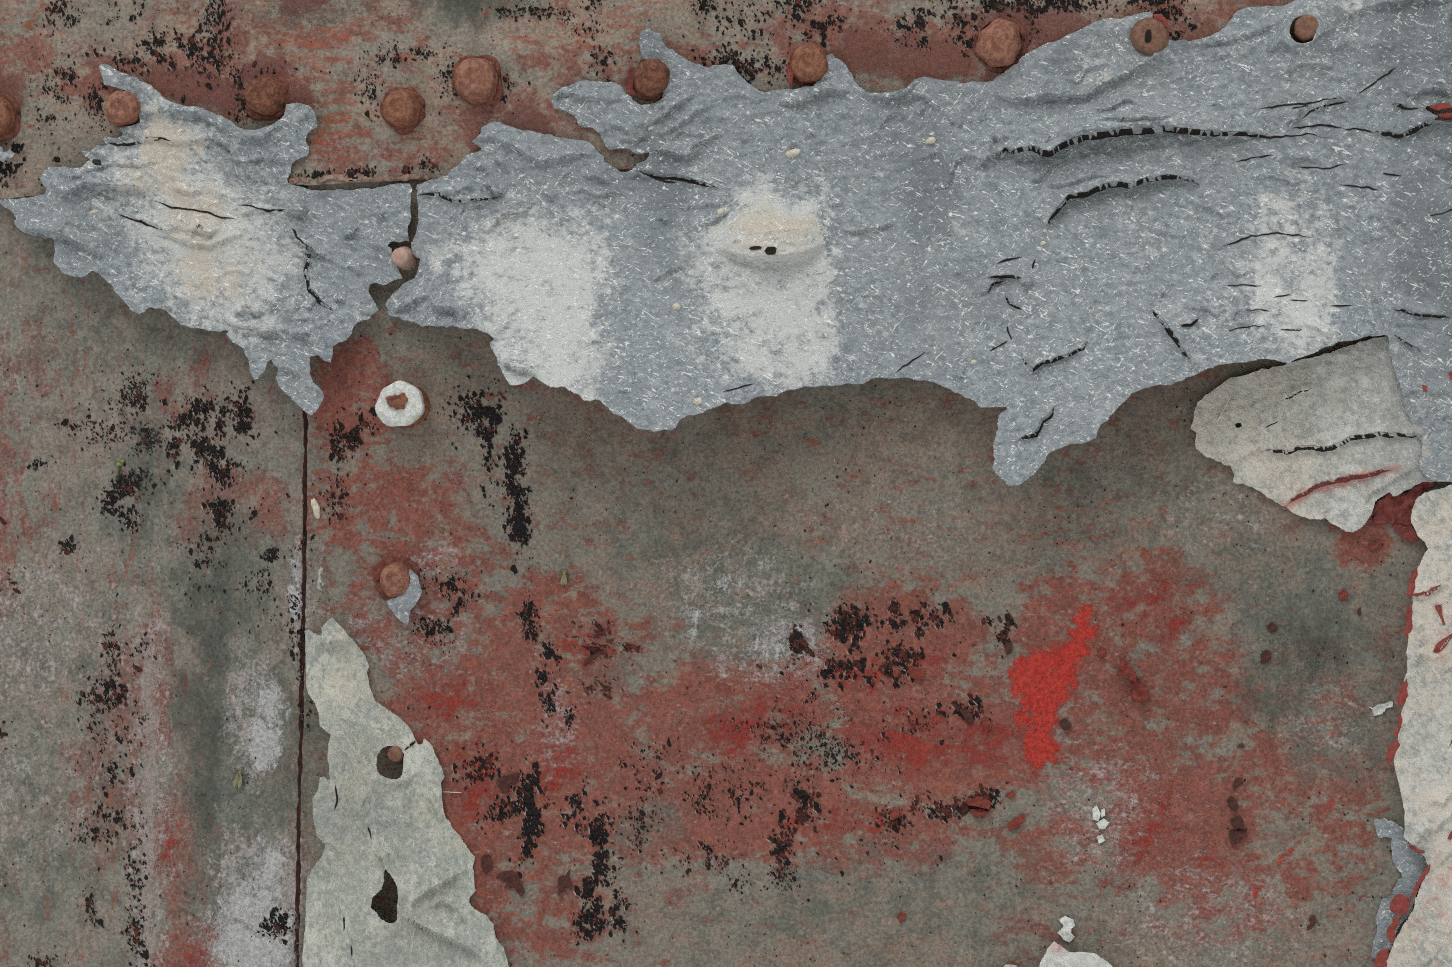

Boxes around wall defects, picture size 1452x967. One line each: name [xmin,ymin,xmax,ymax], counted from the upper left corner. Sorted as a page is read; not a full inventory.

rust [0,0,298,188]
rust [320,39,462,130]
rust [480,0,622,82]
peeling [0,64,412,415]
rust [54,364,408,682]
rust [407,565,482,657]
rust [437,375,532,575]
peeling [302,0,1452,967]
rust [58,623,179,967]
rust [446,588,1018,946]
rust [12,945,69,967]
rust [255,906,300,945]